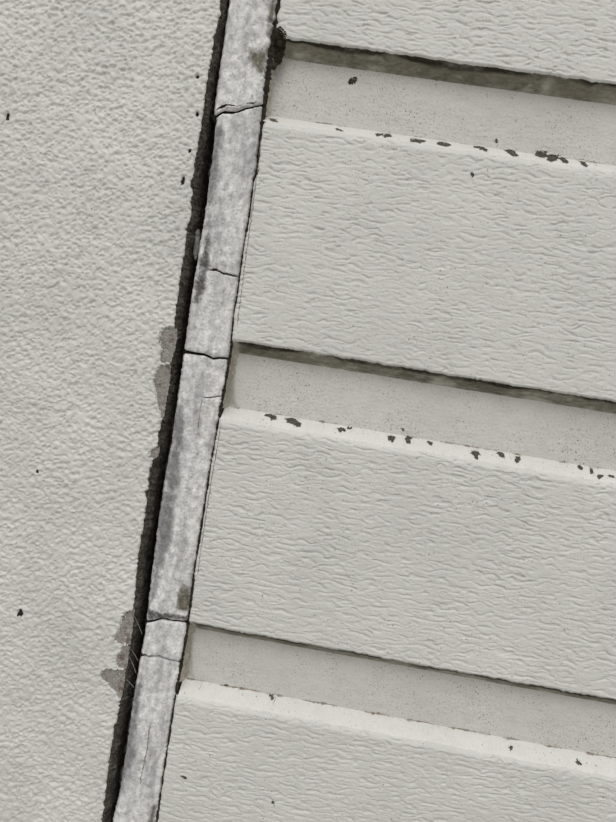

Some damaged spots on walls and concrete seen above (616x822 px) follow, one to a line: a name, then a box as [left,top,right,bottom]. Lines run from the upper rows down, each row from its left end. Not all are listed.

peeling [535,148,588,167]
spalling [101,0,229,822]
crack [140,0,281,822]
peeling [264,413,301,427]
peeling [388,428,412,444]